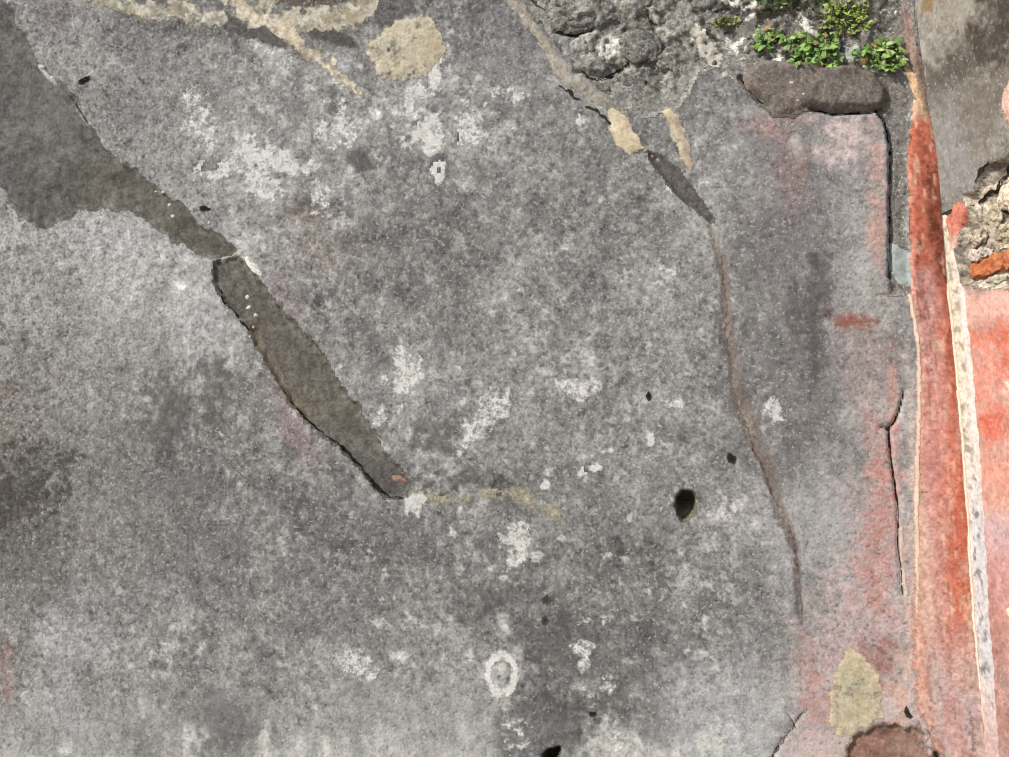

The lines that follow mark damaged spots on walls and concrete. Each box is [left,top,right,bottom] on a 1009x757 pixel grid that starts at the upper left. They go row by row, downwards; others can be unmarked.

spalling [945,153,1009,291]
crack [710,226,803,625]
crack [881,391,904,594]
crack [665,582,751,615]
crack [772,708,807,757]
spalling [826,645,938,757]